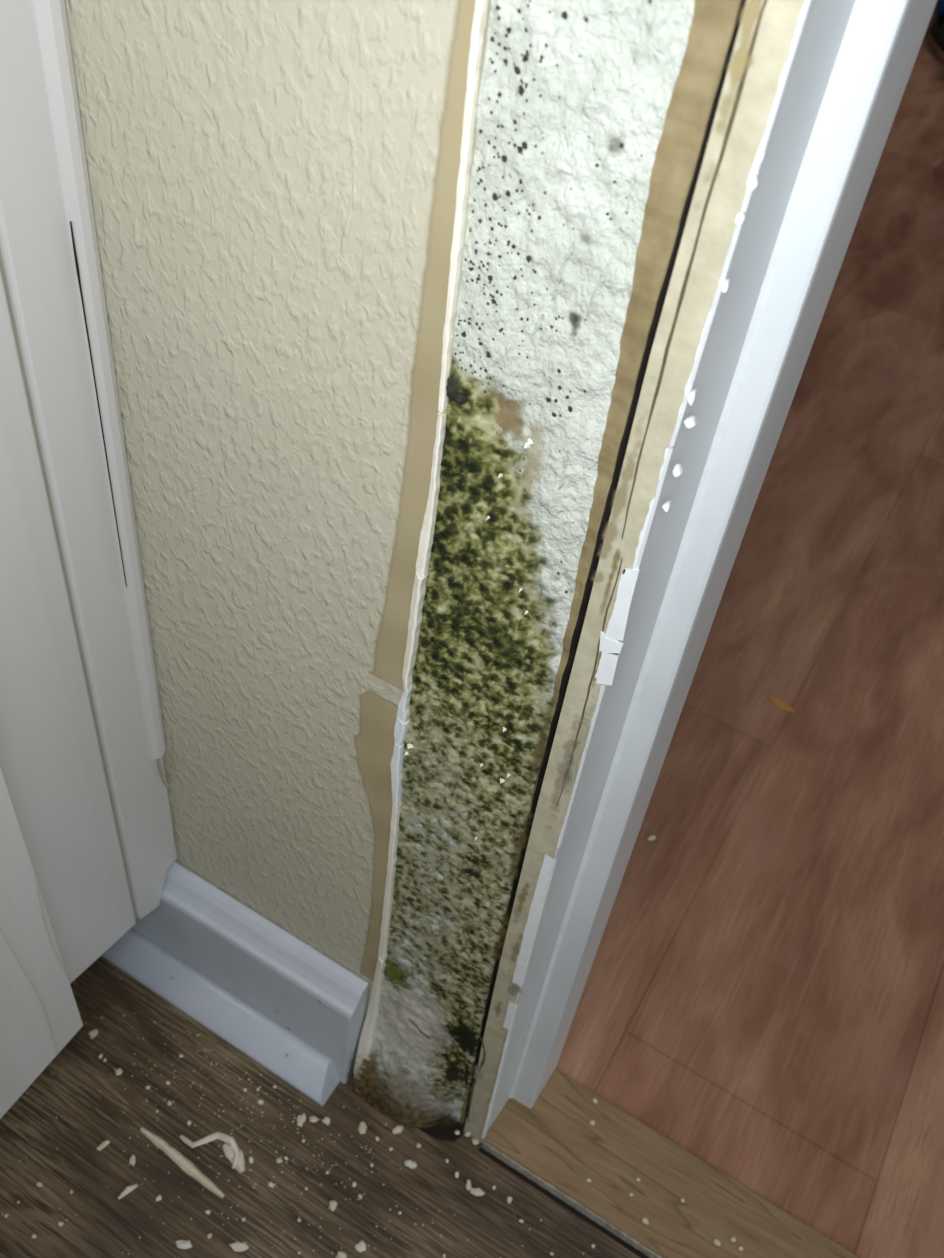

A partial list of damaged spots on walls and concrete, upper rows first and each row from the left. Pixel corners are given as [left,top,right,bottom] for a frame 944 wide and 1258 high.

leakage [723,0,761,112]
leakage [516,288,586,359]
leakage [546,369,586,417]
peeling [354,0,487,1092]
leakage [351,0,568,1128]
leakage [595,461,633,594]
peeling [460,0,813,1138]
leakage [554,719,589,805]